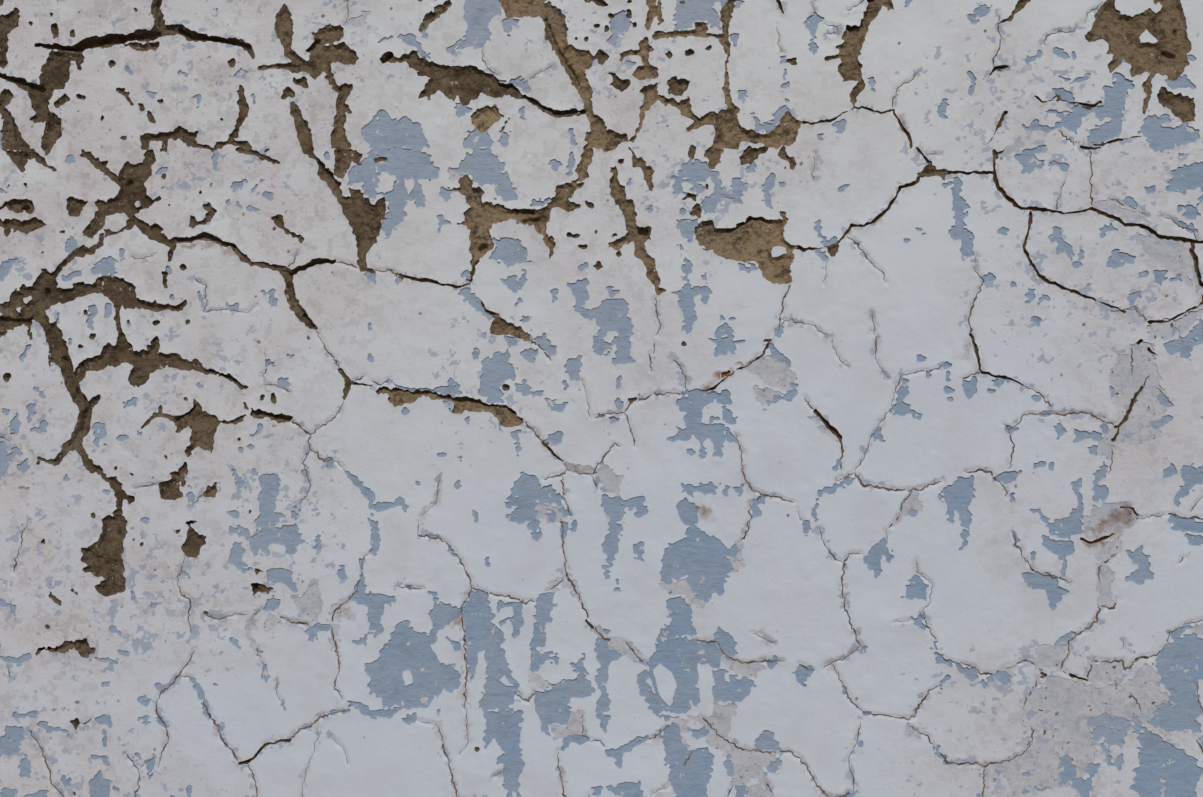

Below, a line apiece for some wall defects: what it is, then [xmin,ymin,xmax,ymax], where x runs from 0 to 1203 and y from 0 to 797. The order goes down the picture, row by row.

spalling [0,0,33,69]
crack [776,0,784,50]
crack [989,0,1031,75]
spalling [189,58,304,244]
crack [0,0,499,597]
spalling [281,0,912,459]
spalling [992,0,1203,610]
spalling [93,354,294,504]
crack [417,70,1203,797]
spalling [176,520,206,579]
crack [28,730,64,797]
crack [126,554,368,797]